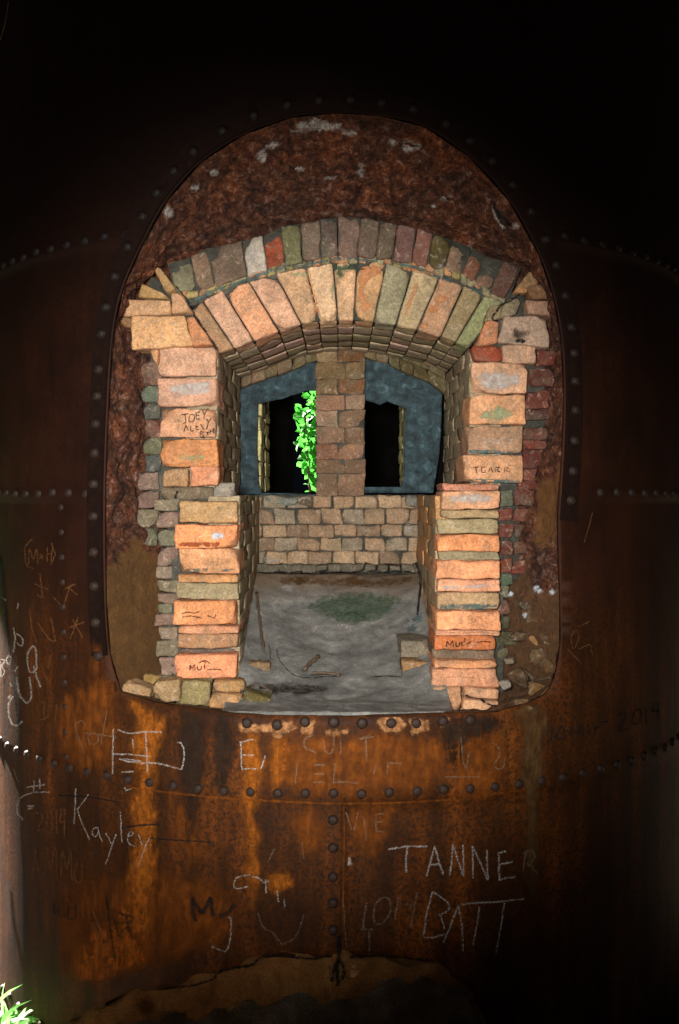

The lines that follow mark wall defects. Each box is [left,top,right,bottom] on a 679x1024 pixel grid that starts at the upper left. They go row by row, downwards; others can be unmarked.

rust [59,684,114,768]
rust [73,702,195,981]
water stain [178,714,234,838]
rust [208,717,519,913]